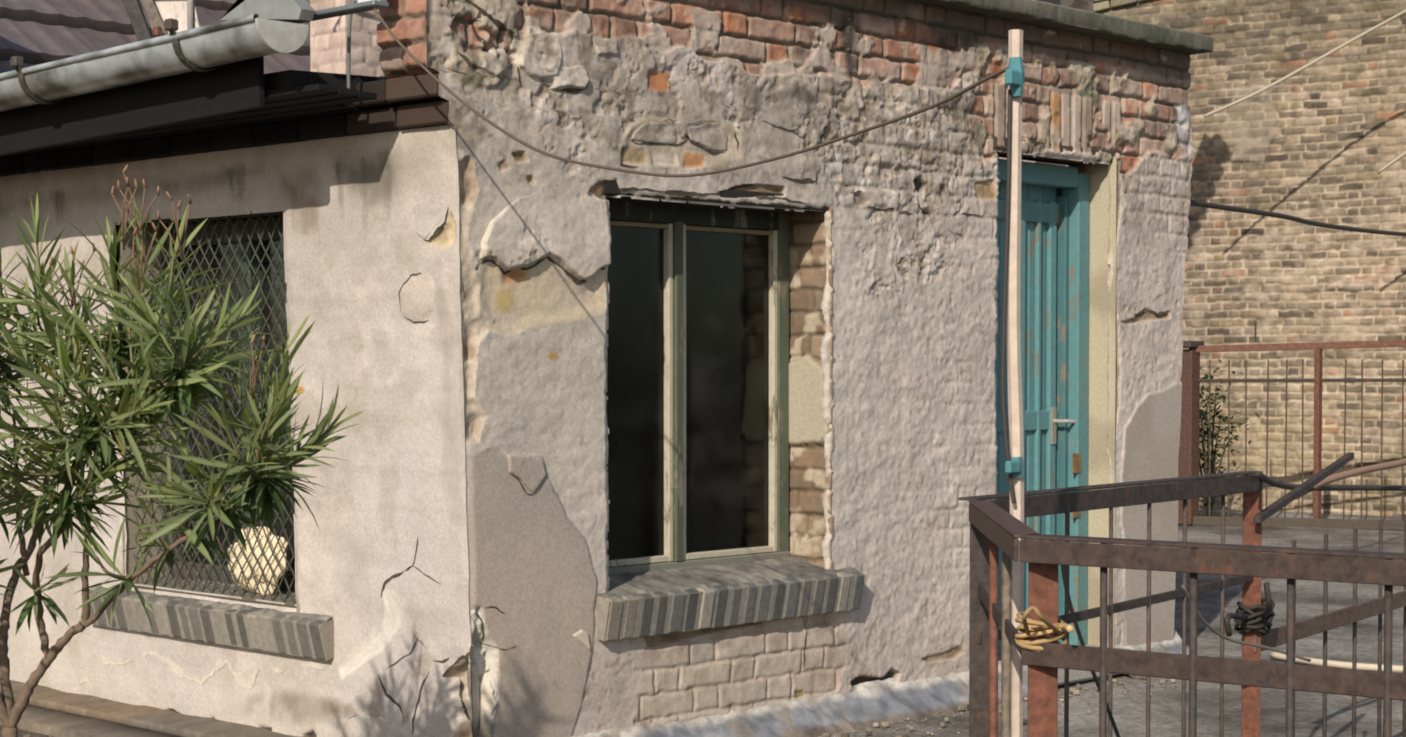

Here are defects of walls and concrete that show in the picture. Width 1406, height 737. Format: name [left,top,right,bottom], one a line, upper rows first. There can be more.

flaking render [377,0,1193,456]
crack [381,537,440,595]
crack [378,606,515,734]
peeling [573,629,591,651]
spalling [633,613,900,725]